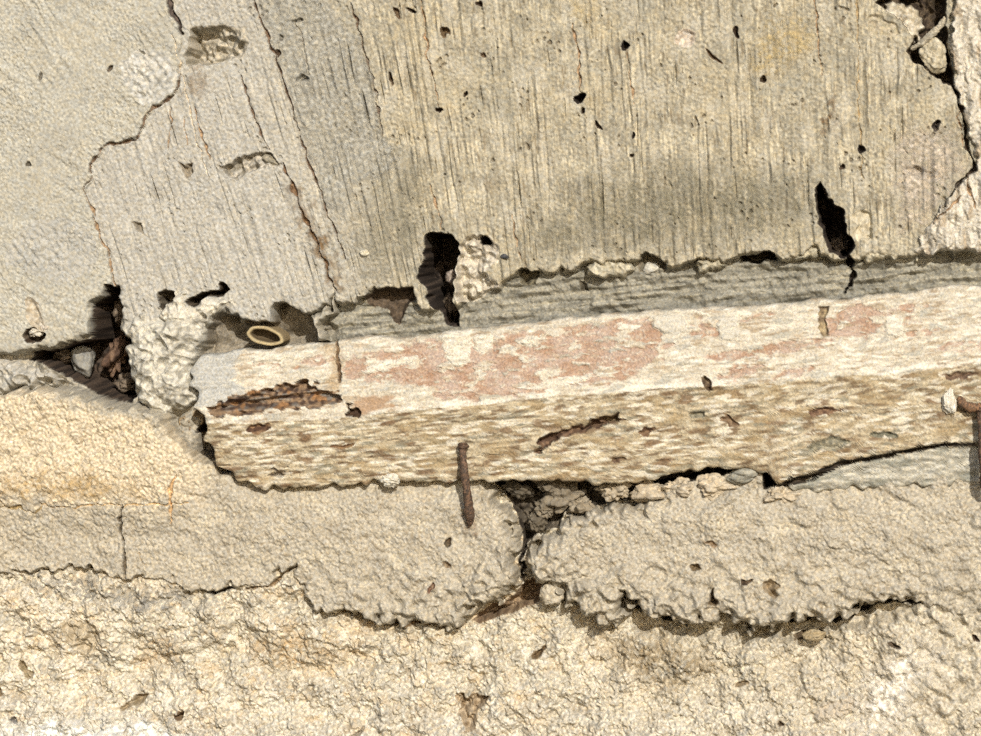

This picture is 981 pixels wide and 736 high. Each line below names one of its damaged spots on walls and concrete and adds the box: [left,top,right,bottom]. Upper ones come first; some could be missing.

spalling [118,25,251,106]
crack [83,0,211,286]
spalling [218,152,280,182]
crack [241,0,346,292]
crack [933,86,978,224]
spalling [23,285,138,404]
spalling [157,282,230,313]
peeling [363,356,419,374]
spalling [364,233,502,368]
peeling [527,373,595,390]
crack [844,256,857,294]
crack [0,478,296,596]